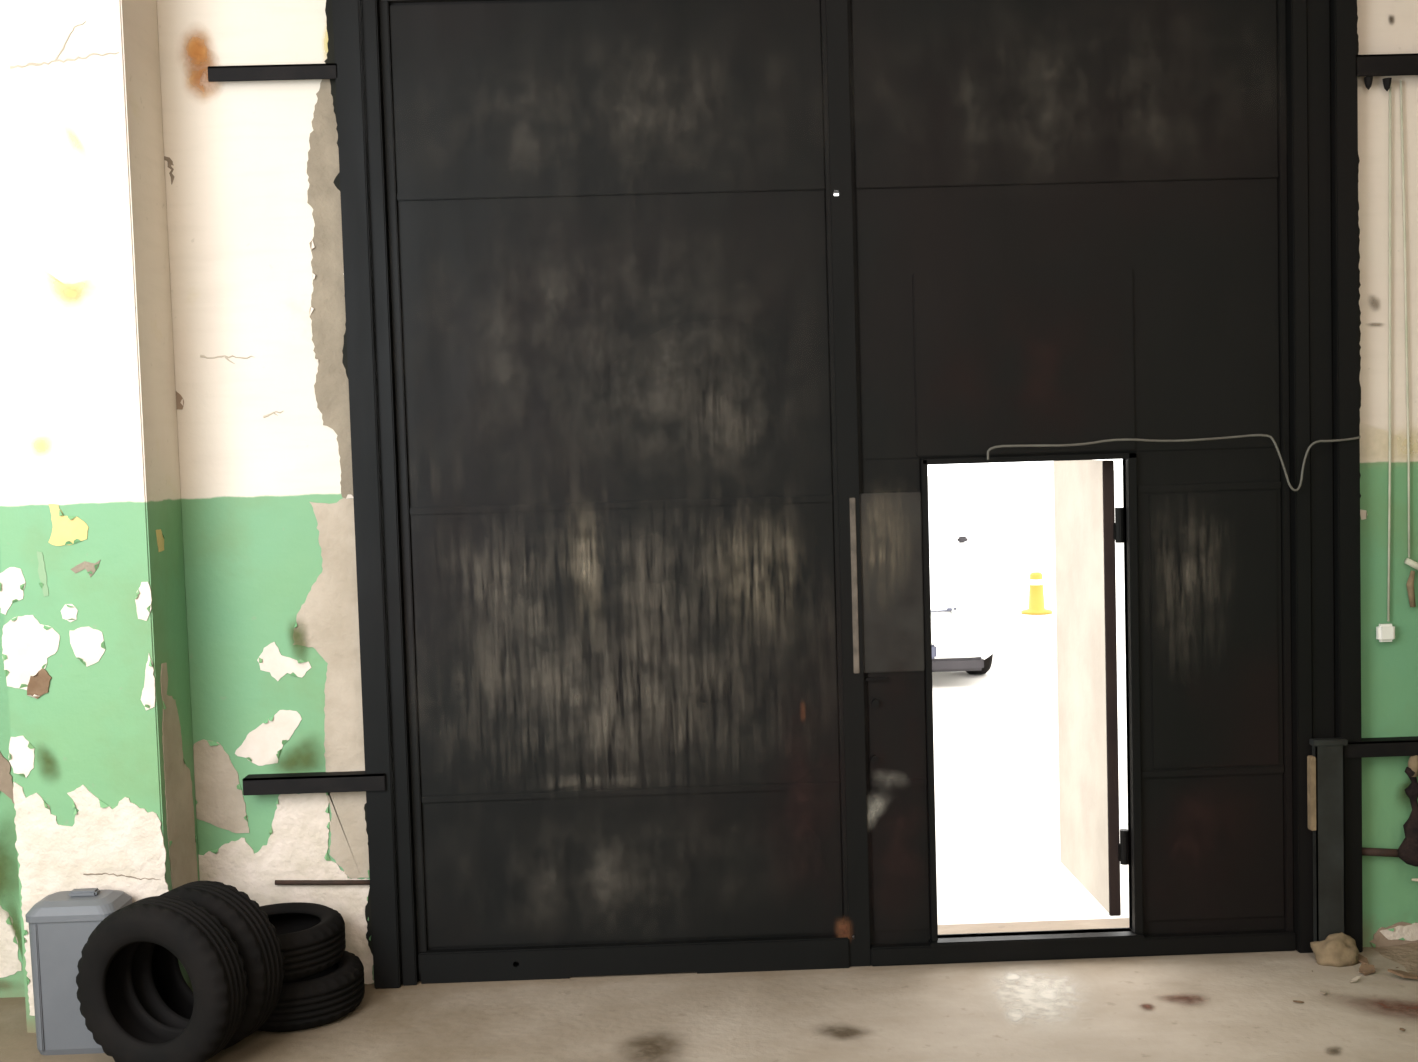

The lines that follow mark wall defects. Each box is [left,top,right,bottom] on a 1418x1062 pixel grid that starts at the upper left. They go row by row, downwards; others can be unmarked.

crack [10,21,119,69]
rust [185,35,209,94]
flaking render [176,391,184,410]
flaking render [257,79,365,772]
peeling [156,529,165,552]
peeling [0,504,106,699]
peeling [135,582,152,621]
peeling [0,654,374,1016]